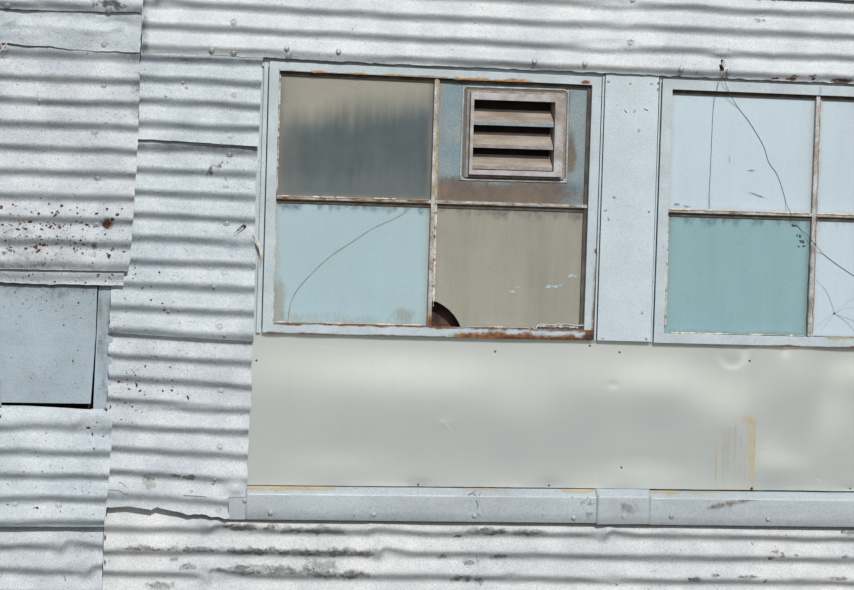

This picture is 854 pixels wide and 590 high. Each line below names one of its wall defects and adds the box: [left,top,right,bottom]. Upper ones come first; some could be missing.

corrosion [0,198,128,266]
crack [287,207,411,321]
corrosion [274,276,595,340]
crack [816,280,854,329]